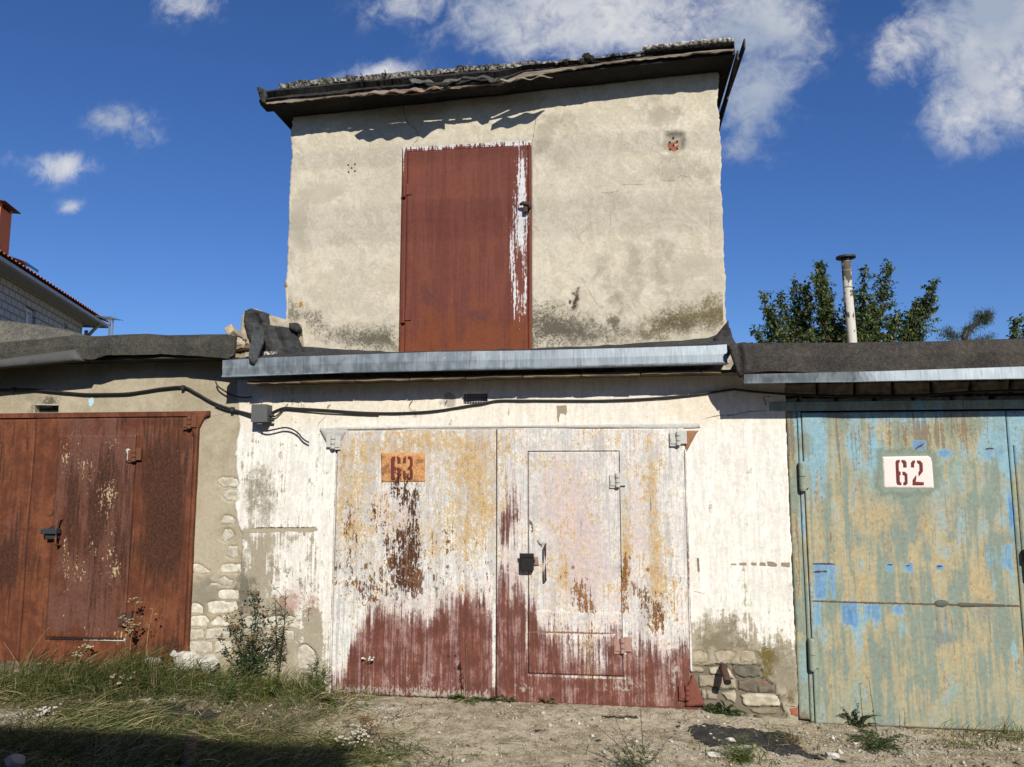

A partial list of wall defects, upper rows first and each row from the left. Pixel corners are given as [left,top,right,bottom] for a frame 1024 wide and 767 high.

leakage [288,299,397,351]
leakage [532,287,620,347]
spalling [217,477,239,502]
corrosion [383,468,425,597]
peeling [190,515,318,670]
corrosion [570,577,597,613]
corrosion [617,551,670,636]
leakage [699,613,752,650]
spalling [690,650,798,719]